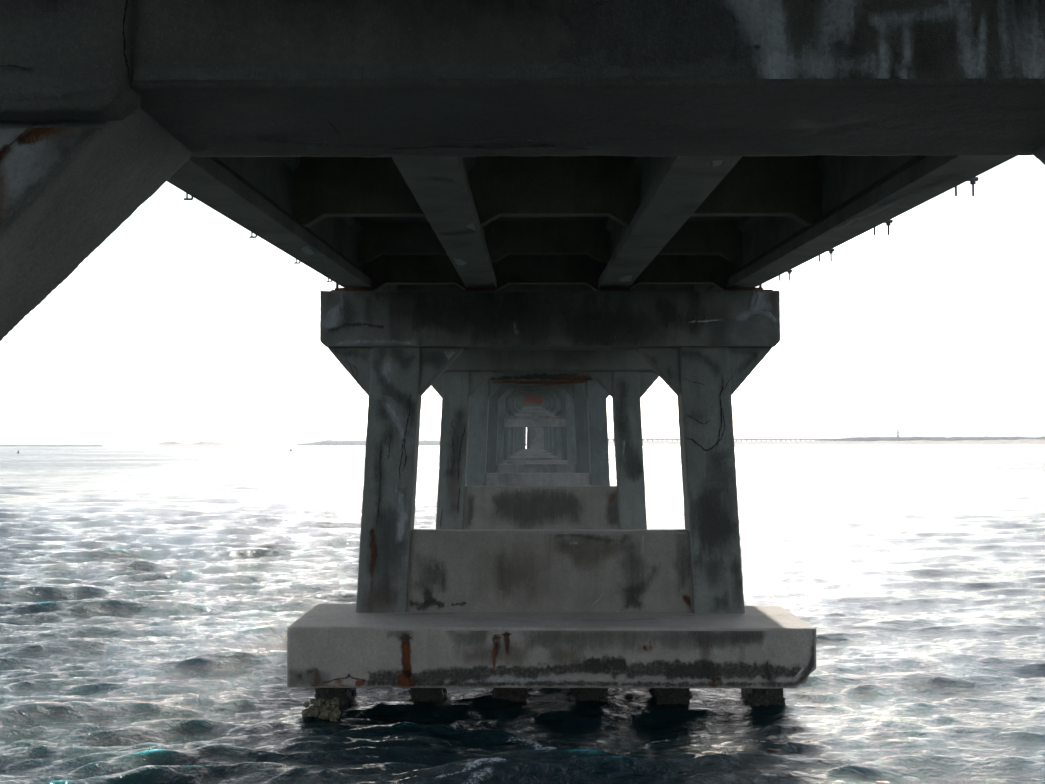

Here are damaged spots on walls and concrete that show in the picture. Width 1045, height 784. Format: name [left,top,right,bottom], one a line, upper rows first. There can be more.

damp [863,0,986,79]
damp [0,128,82,225]
crack [685,375,733,451]
crack [377,393,411,521]
rust [397,634,418,687]
rust [493,632,511,672]
damp [368,656,801,687]